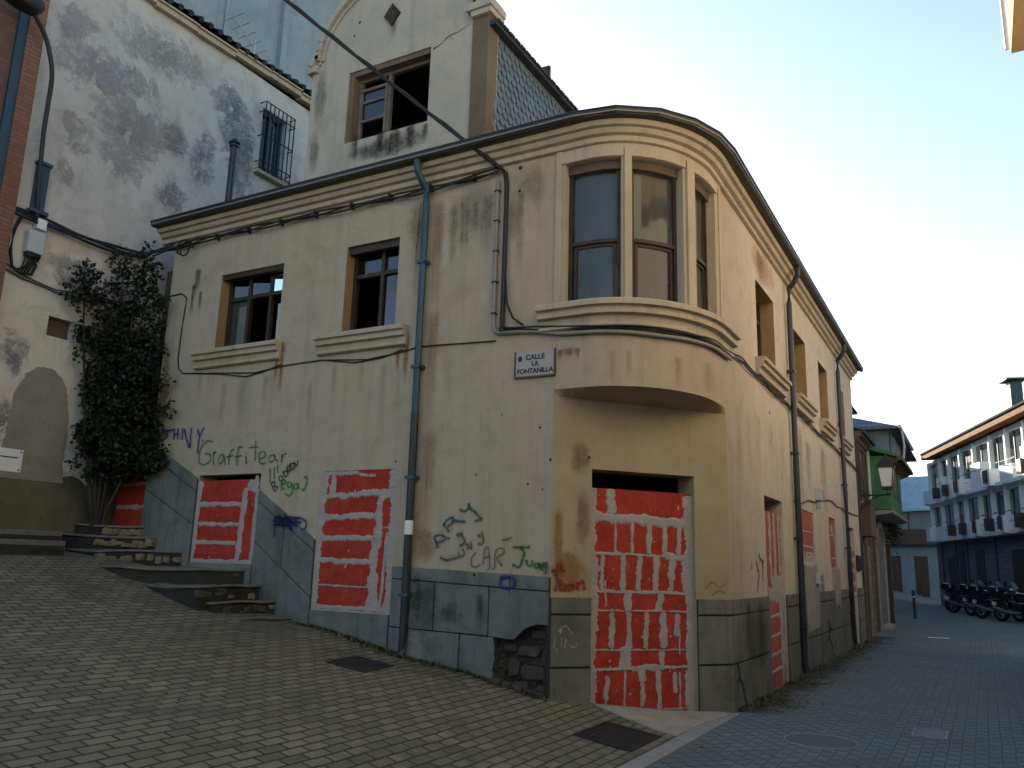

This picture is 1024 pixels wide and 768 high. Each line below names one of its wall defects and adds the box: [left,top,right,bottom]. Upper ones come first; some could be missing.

water stain [353,126,427,156]
flaking render [507,645,545,689]